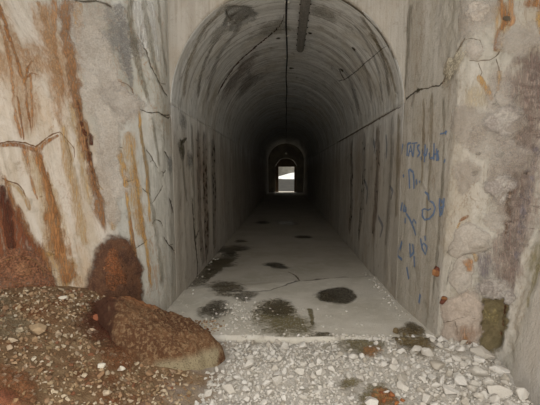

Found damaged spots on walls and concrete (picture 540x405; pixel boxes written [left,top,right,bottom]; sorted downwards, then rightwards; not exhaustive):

corrosion [494,0,515,50]
crack [466,29,505,106]
crack [0,132,75,168]
corrosion [0,0,115,242]
peeling [472,72,531,230]
corrosion [0,148,76,286]
corrosion [117,107,151,285]
water stain [198,300,231,318]
water stain [315,287,357,304]
spalling [479,297,509,352]